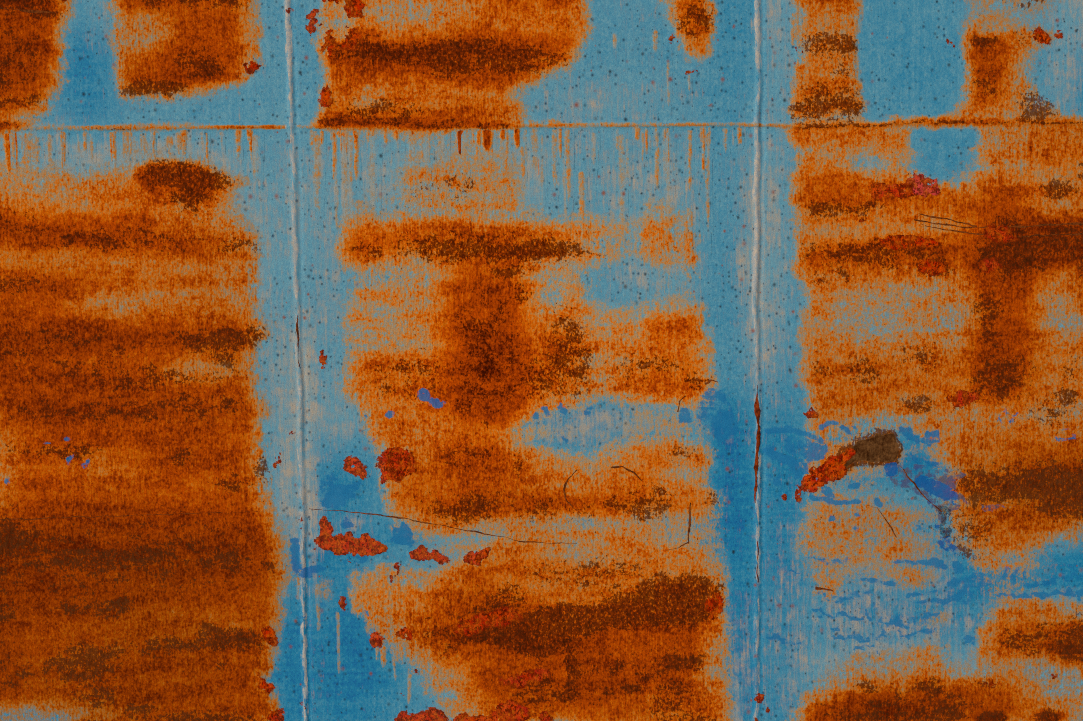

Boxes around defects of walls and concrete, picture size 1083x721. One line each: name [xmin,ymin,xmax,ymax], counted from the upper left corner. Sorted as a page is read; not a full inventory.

peeling [282,2,296,25]
rust [0,0,747,721]
rust [299,0,1083,721]
peeling [340,444,421,487]
peeling [293,506,495,586]
peeling [367,621,416,652]
peeling [370,665,515,721]